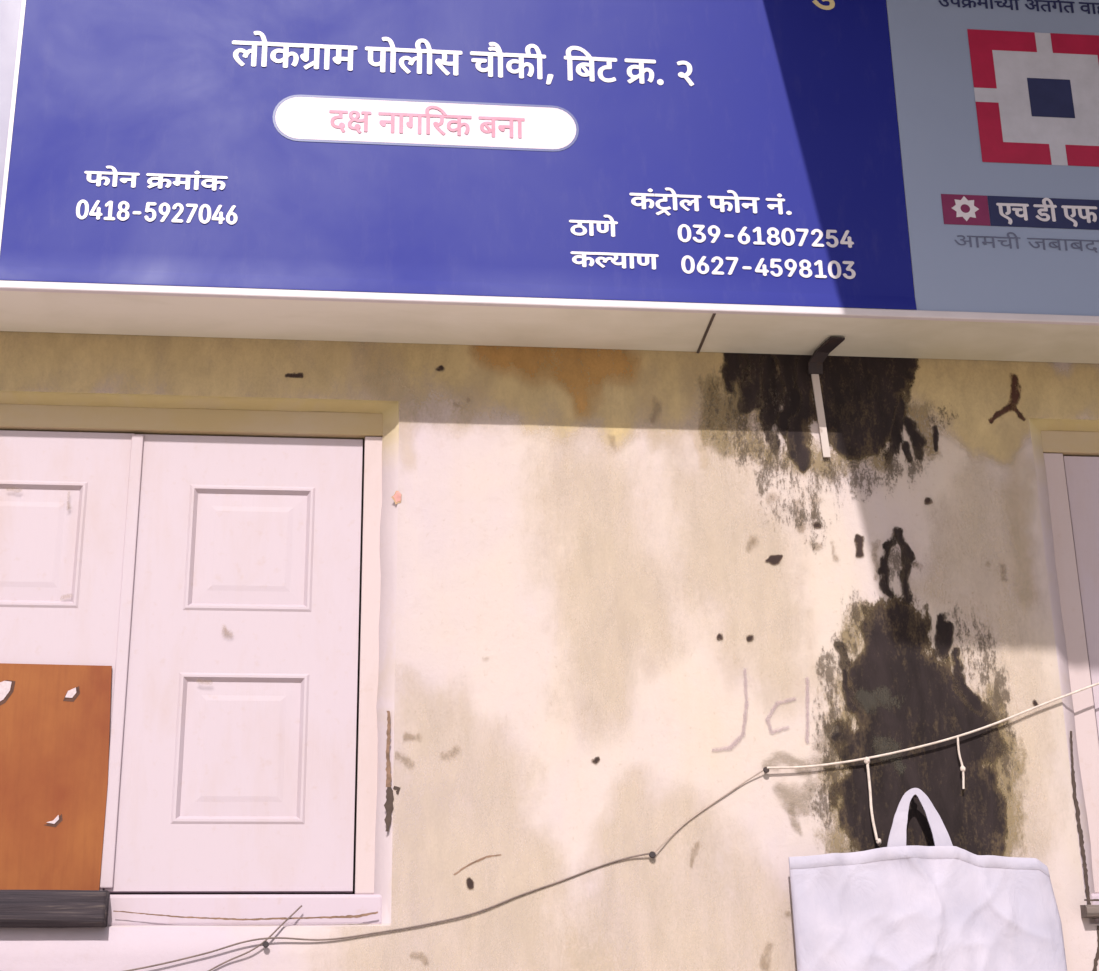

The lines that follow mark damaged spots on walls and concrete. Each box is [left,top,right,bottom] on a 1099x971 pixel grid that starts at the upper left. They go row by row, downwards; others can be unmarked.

damp [0,331,1099,550]
damp [811,527,1036,857]